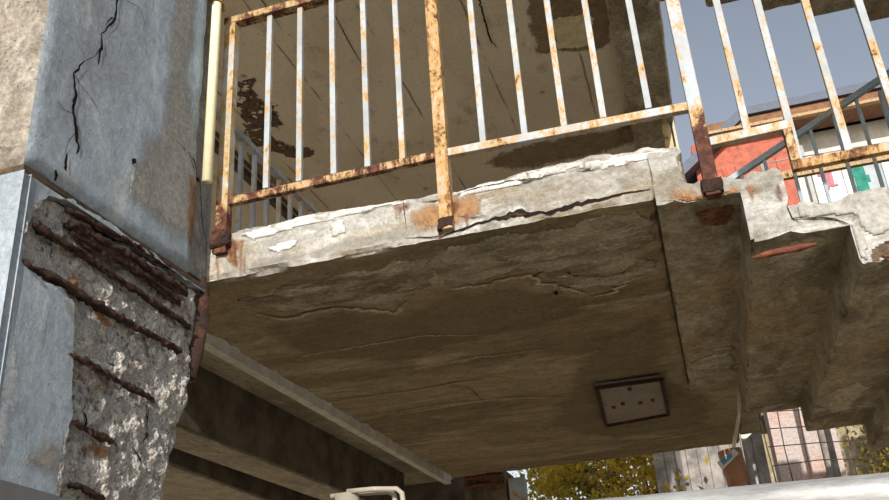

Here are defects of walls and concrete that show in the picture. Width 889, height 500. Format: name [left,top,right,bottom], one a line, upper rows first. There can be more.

water stain [527,0,611,54]
crack [54,0,143,181]
water stain [484,125,634,170]
crack [453,174,555,197]
crack [403,189,650,238]
rust [671,190,707,208]
rust [695,205,735,227]
peeling [797,188,889,266]
spalling [21,200,210,500]
rust [85,444,108,458]